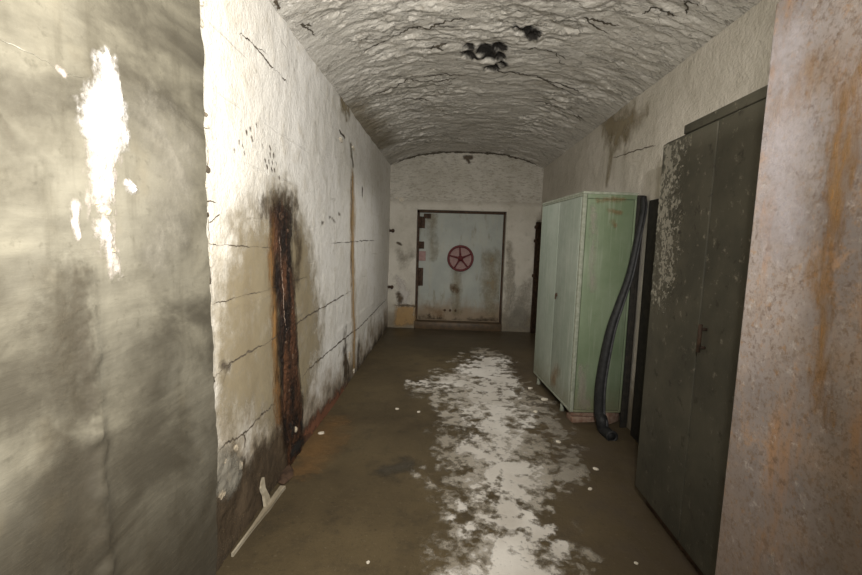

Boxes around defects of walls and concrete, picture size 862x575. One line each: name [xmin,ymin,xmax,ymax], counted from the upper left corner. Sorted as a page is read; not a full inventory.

crack [293,22,314,35]
crack [359,18,467,56]
crack [564,17,619,34]
crack [642,0,699,22]
crack [240,33,287,82]
crack [357,73,456,103]
crack [498,48,581,118]
damp [375,348,600,575]
damp [216,428,289,570]